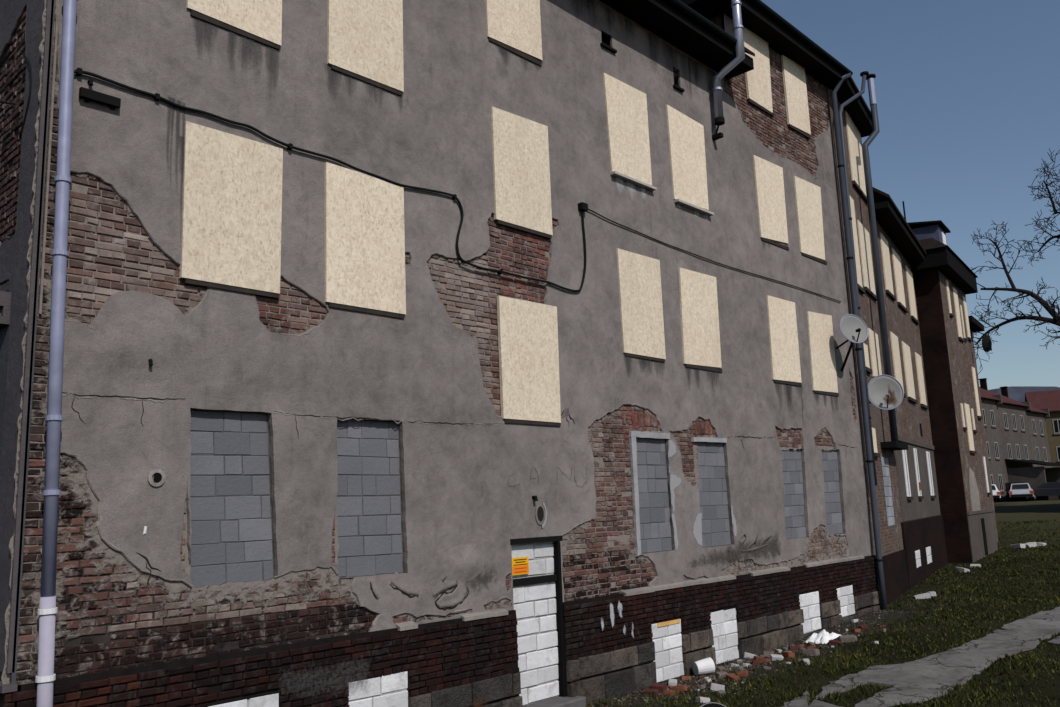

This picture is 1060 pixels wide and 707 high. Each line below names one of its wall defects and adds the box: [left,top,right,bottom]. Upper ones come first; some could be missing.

flaking render [722,46,831,181]
flaking render [0,0,61,685]
crack [62,391,186,425]
flaking render [65,169,209,329]
flaking render [54,452,513,679]
flaking render [255,273,331,336]
flaking render [405,251,413,267]
flaking render [427,211,560,418]
flaking render [561,404,718,602]
flaking render [720,524,849,576]
flaking render [775,426,837,452]